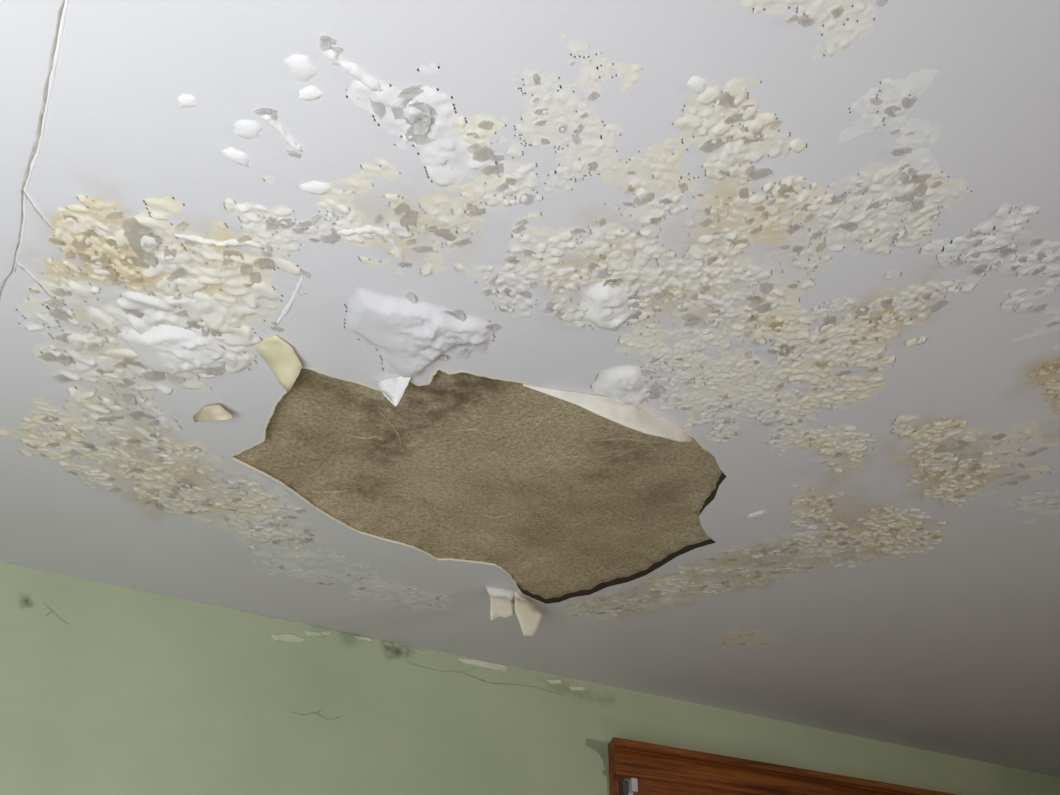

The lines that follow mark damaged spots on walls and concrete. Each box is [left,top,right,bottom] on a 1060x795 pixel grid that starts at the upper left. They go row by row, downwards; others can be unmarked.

crack [0,0,69,299]
peeling [740,0,887,61]
flaking render [0,34,1060,636]